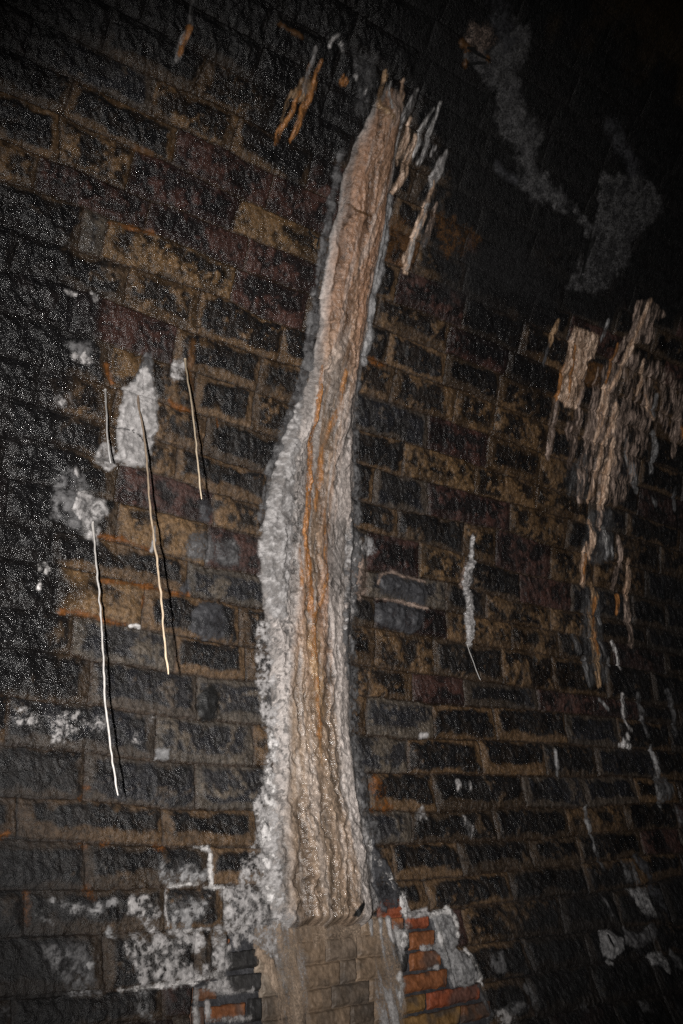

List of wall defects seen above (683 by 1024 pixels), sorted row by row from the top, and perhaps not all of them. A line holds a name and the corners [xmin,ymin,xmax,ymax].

damp [274,36,378,144]
damp [402,180,438,275]
damp [350,536,376,600]
damp [459,534,477,647]
damp [42,846,307,1022]
flaking render [189,897,491,1024]